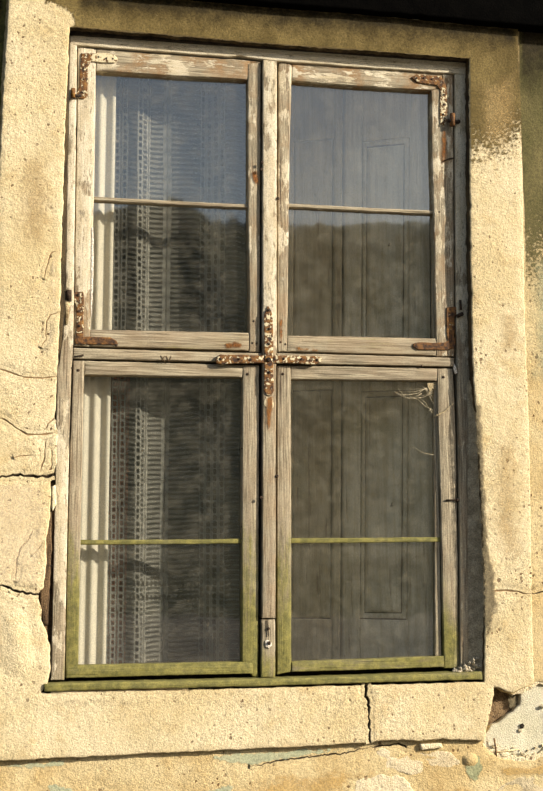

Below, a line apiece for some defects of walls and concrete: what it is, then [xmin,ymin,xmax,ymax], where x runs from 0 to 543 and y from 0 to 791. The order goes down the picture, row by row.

peeling [45,0,543,307]
crack [0,365,57,382]
crack [0,414,56,482]
crack [493,586,543,598]
crack [250,683,436,770]
flaking render [482,681,543,762]
flaking render [355,743,483,791]